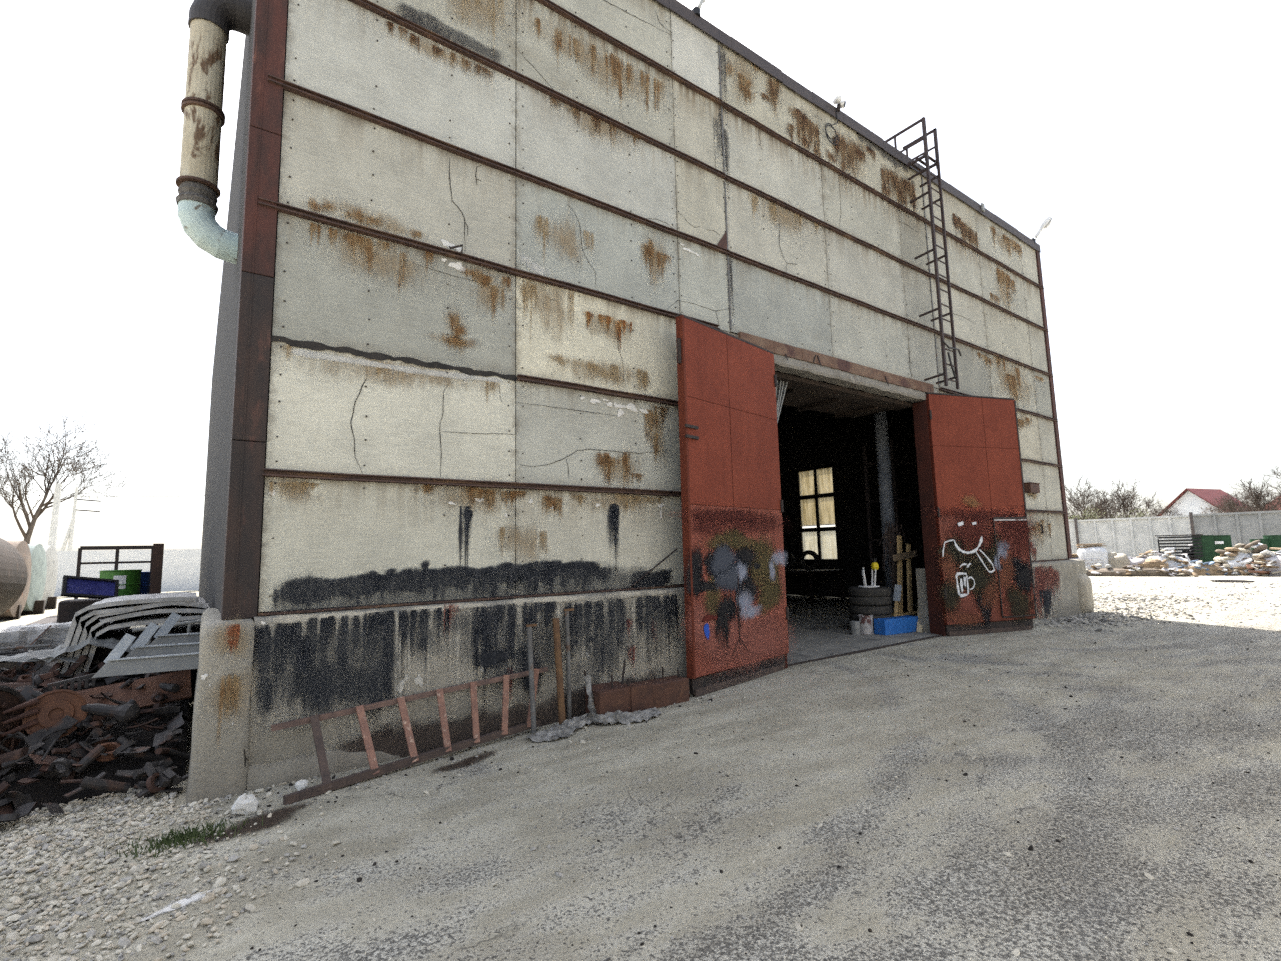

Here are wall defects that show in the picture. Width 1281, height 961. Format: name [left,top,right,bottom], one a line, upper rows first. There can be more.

corrosion [535,18,662,108]
corrosion [726,62,916,210]
corrosion [308,199,434,287]
crack [449,158,481,238]
corrosion [642,239,671,276]
corrosion [953,213,1022,253]
corrosion [442,314,471,347]
crack [350,378,367,472]
crack [439,381,664,477]
corrosion [597,452,661,509]
damp [252,569,678,701]
damp [344,683,596,758]